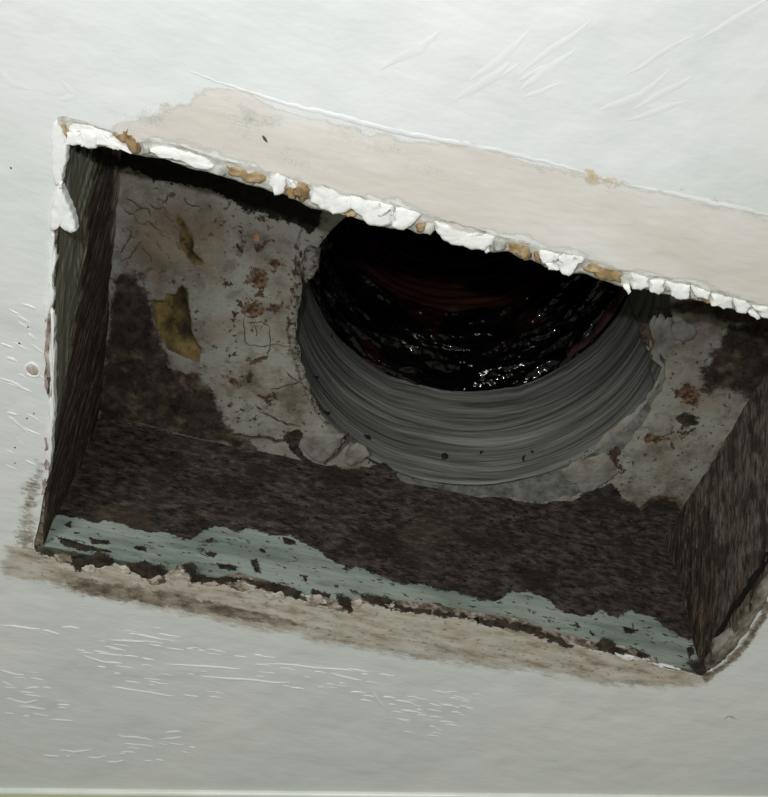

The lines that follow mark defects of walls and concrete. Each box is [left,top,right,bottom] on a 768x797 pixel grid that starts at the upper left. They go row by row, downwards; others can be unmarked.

crack [121,194,200,263]
peeling [50,71,768,320]
spalling [151,285,201,362]
rust [231,230,291,330]
water stain [44,145,720,662]
rust [607,444,626,474]
rust [641,383,700,451]
water stain [2,546,701,686]
spalling [35,548,768,682]